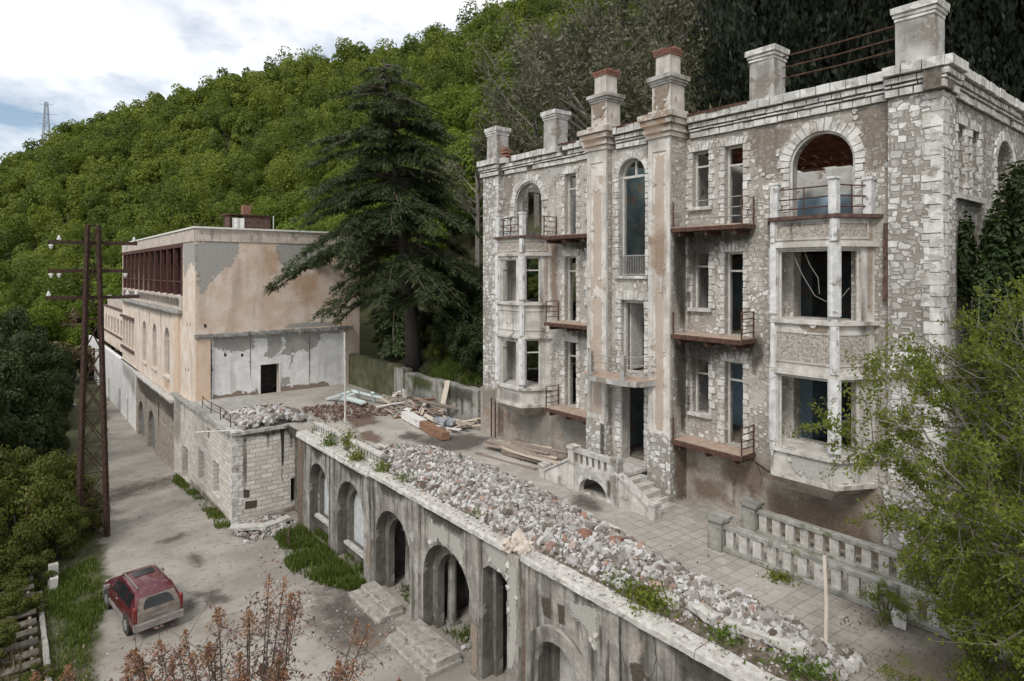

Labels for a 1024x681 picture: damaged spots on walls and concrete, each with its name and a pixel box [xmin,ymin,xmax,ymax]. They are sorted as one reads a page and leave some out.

peeling [183,241,239,294]
flaking render [213,330,341,359]
flaking render [213,389,259,399]
flaking render [281,377,329,391]
leakage [675,447,872,554]
flaking render [541,595,600,650]